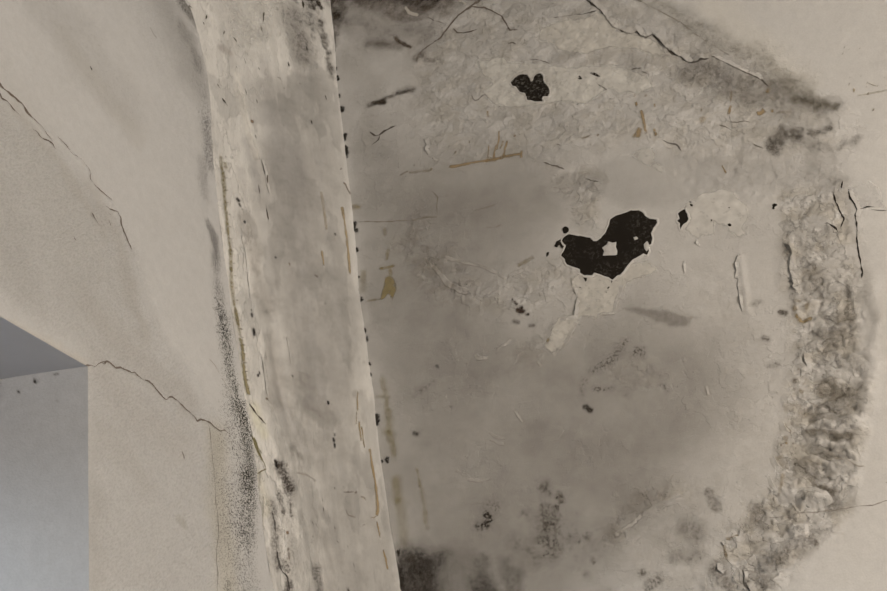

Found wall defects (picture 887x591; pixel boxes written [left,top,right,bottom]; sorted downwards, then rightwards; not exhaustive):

mould [308,0,340,81]
peeling [480,58,651,107]
crack [554,0,768,86]
crack [0,83,132,249]
mould [767,128,802,153]
spalling [545,208,659,352]
peeling [675,189,748,247]
peeling [784,224,821,300]
crack [828,181,887,278]
mould [206,220,257,591]
crack [86,360,230,591]
mould [397,550,436,591]